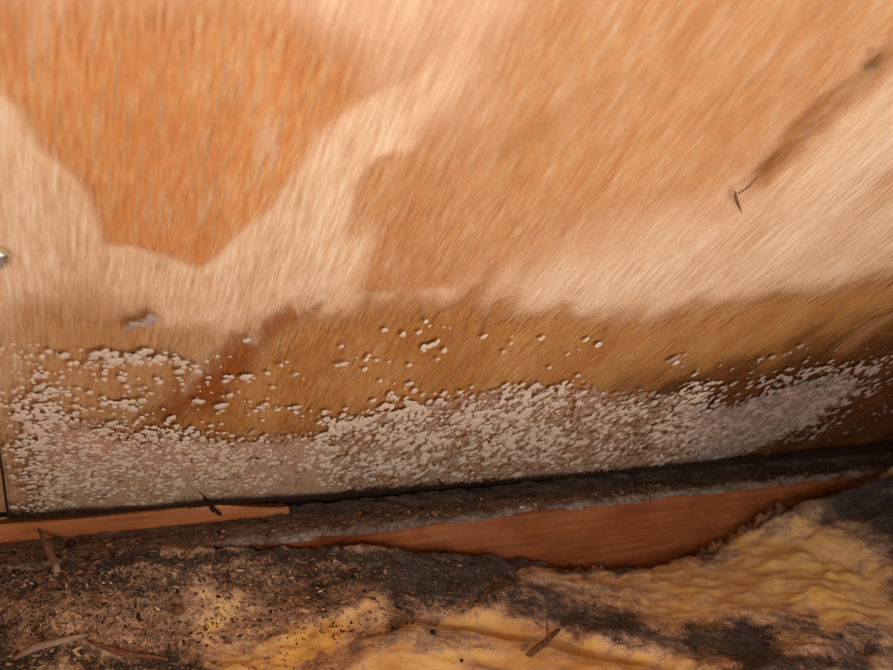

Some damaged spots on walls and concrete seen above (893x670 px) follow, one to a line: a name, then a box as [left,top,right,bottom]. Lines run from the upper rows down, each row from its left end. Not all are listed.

leakage [0,0,893,521]